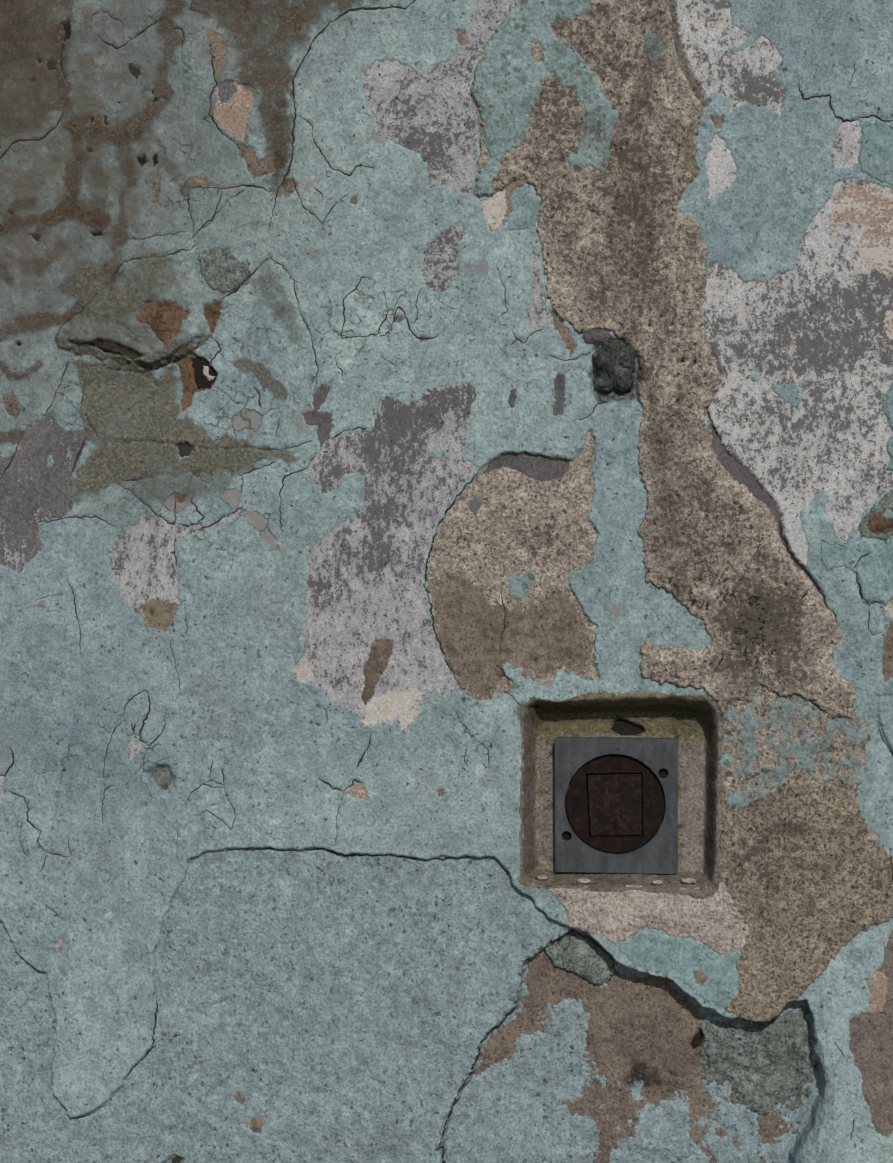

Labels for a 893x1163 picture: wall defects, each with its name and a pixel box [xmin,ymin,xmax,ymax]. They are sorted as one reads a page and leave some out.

leakage [0,0,359,245]
leakage [0,430,24,443]
peeling [0,381,92,573]
leakage [57,338,297,502]
spalling [176,354,218,412]
crack [42,0,439,566]
peeling [292,381,598,732]
spalling [363,0,893,718]
crack [2,746,72,872]
crack [101,600,188,822]
spalling [0,683,893,1163]
crack [438,985,521,1163]